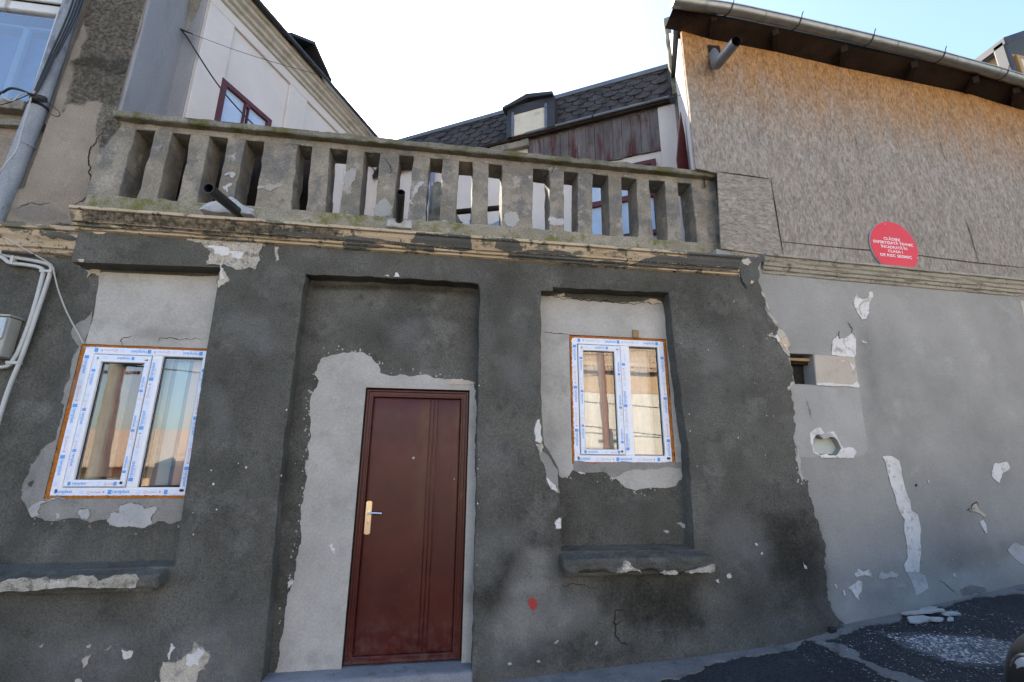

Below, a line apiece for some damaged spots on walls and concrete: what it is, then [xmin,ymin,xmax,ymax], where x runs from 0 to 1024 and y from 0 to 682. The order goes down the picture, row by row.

crack [75,134,101,205]
spalling [187,239,280,288]
peeling [831,291,873,371]
peeling [534,419,544,452]
spalling [791,427,856,485]
peeling [991,461,1010,483]
peeling [26,496,66,525]
peeling [107,502,159,535]
peeling [834,455,929,603]
spalling [0,574,139,592]
spalling [616,560,641,573]
peeling [155,642,211,682]